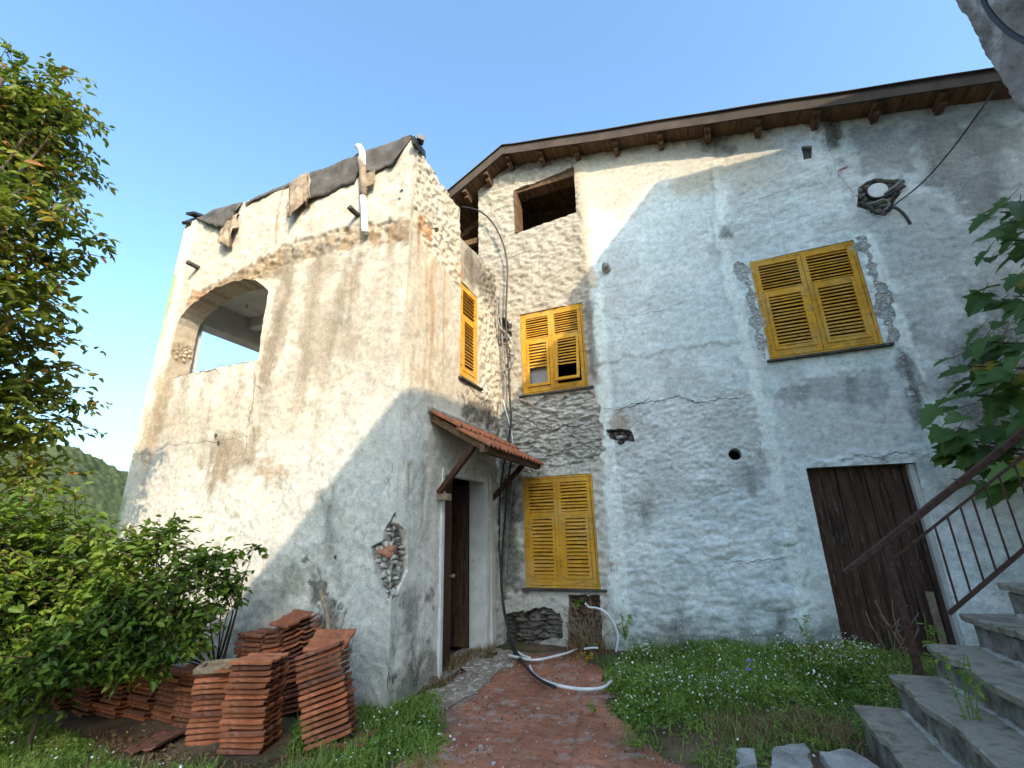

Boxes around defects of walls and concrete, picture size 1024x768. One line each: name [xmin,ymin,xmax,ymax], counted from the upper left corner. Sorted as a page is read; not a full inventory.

flaking render [733,262,769,359]
flaking render [849,236,900,344]
crack [604,395,749,411]
spalling [375,512,405,599]
spalling [506,593,602,644]